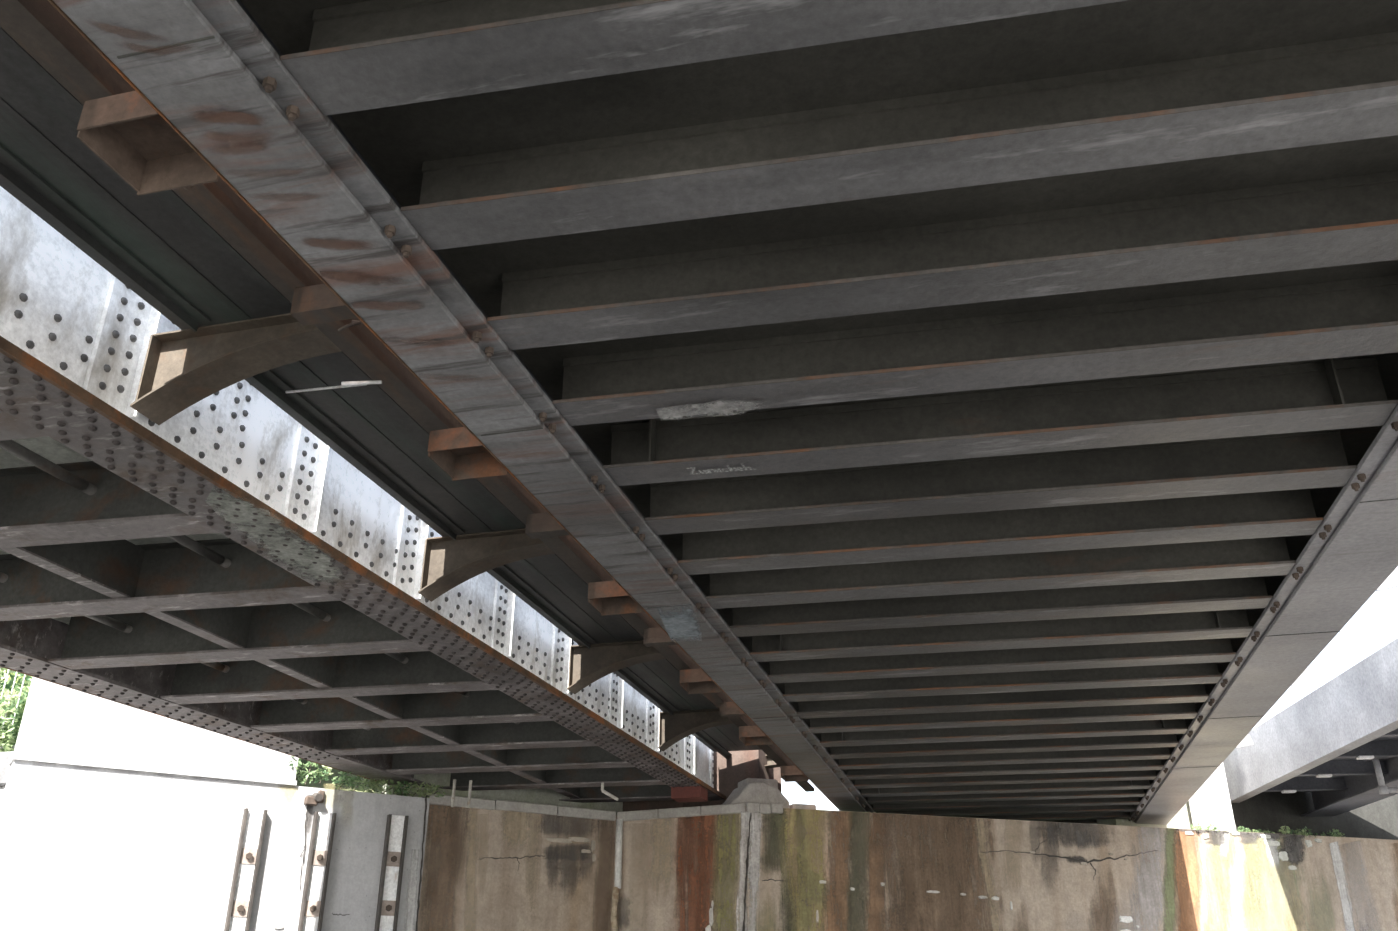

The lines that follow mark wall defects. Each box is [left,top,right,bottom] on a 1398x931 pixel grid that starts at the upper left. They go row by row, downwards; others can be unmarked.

corrosion [48,0,853,931]
damp [503,811,612,931]
crack [981,839,1158,880]
damp [1043,822,1106,848]
corrosion [1174,829,1202,931]